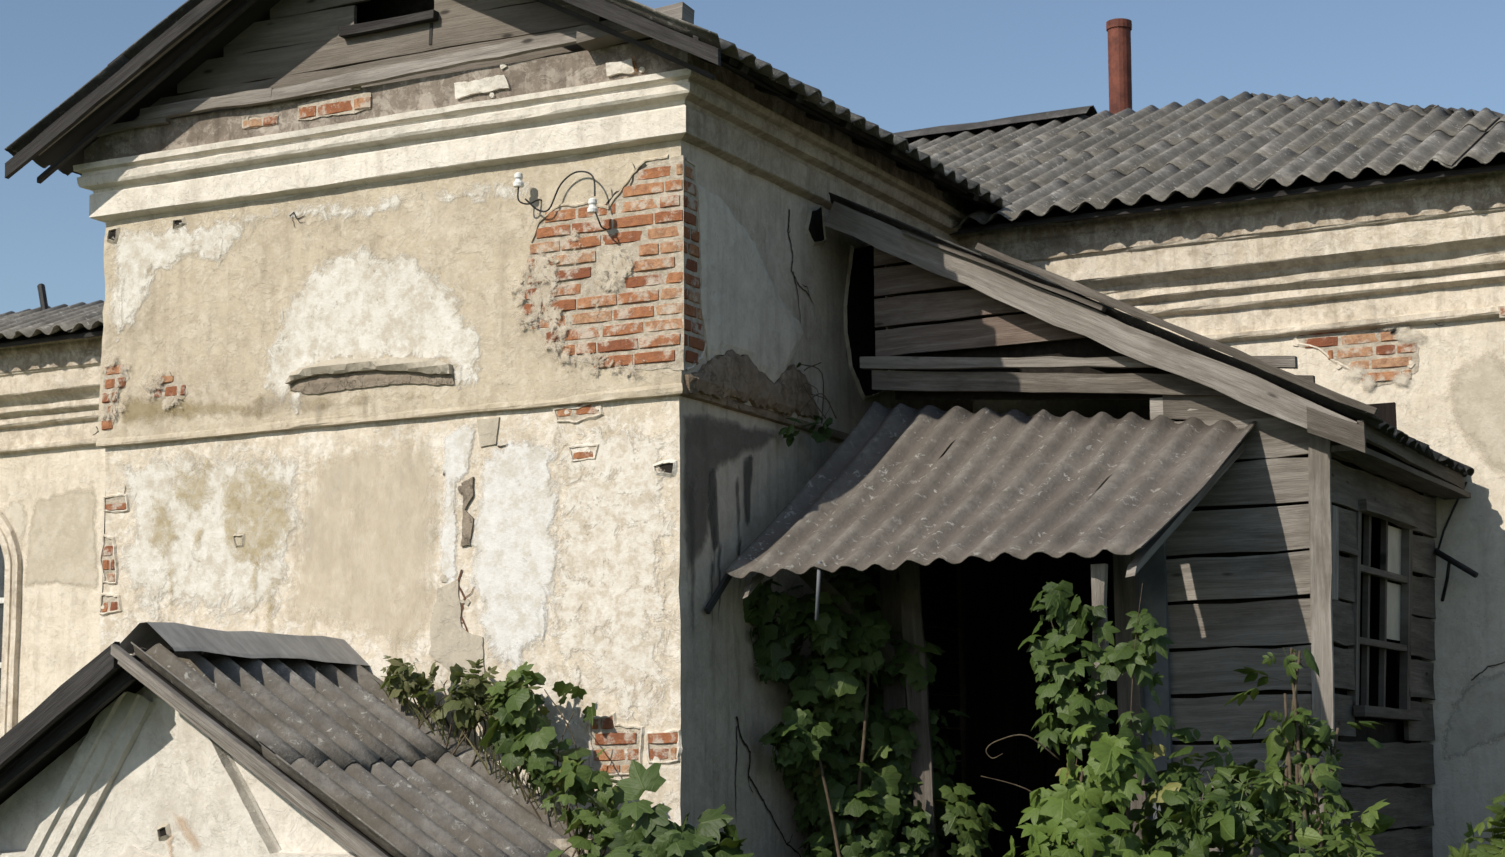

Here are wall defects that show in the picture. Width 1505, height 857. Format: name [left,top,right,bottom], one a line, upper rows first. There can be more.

flaking render [242,115,278,130]
flaking render [297,86,372,120]
peeling [420,181,529,203]
peeling [89,193,401,435]
peeling [453,365,461,390]
flaking render [509,154,820,420]
crack [788,209,814,324]
flaking render [1293,325,1425,390]
peeling [25,449,301,622]
peeling [429,403,683,777]